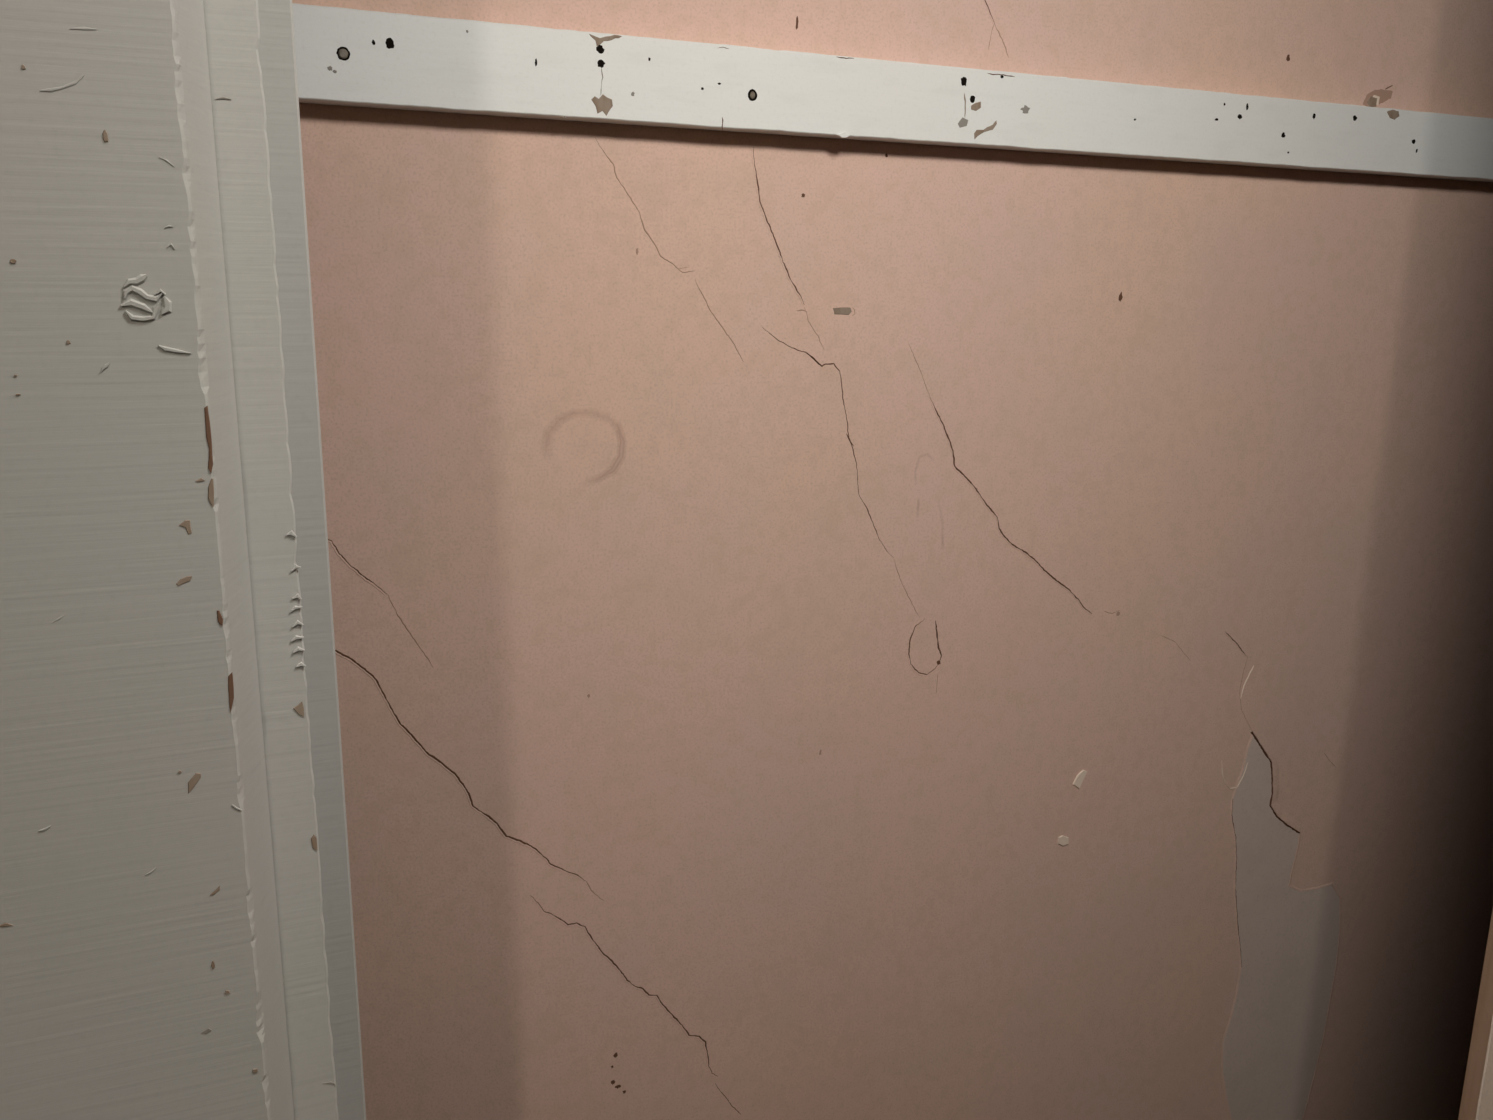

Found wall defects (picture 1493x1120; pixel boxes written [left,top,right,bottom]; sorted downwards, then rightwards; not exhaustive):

crack [328,539,433,667]
crack [595,137,942,692]
crack [909,345,1120,615]
crack [335,650,739,1113]
peeling [1221,724,1341,1120]